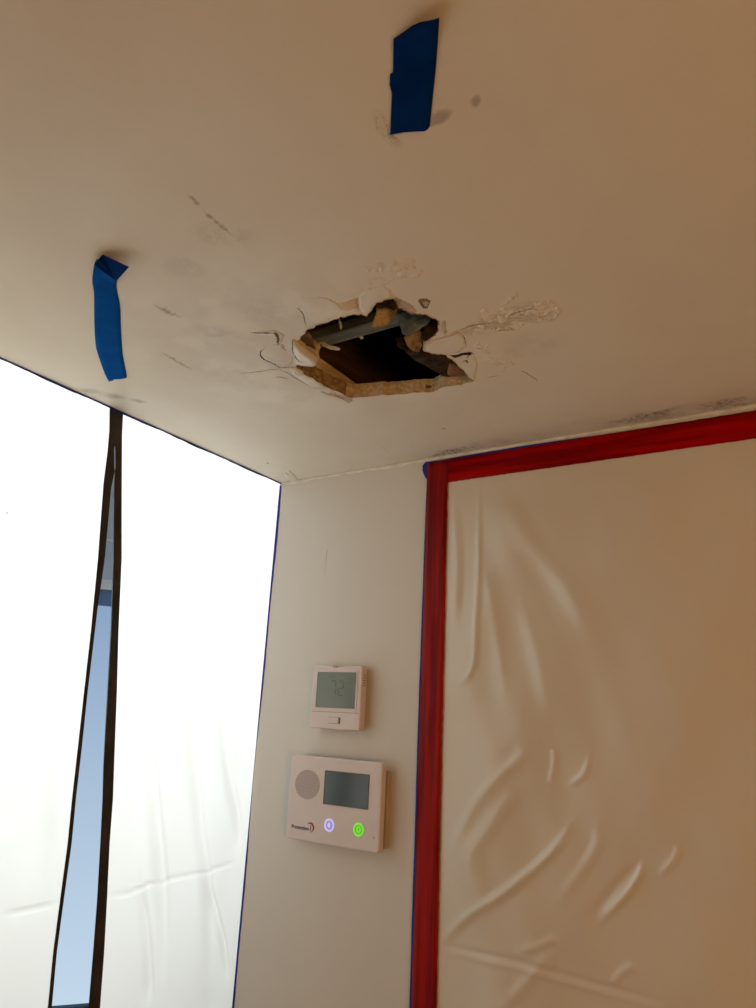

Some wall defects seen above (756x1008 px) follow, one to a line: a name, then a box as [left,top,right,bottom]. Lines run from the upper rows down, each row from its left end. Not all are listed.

crack [241,308,349,402]
flaking render [254,286,478,403]